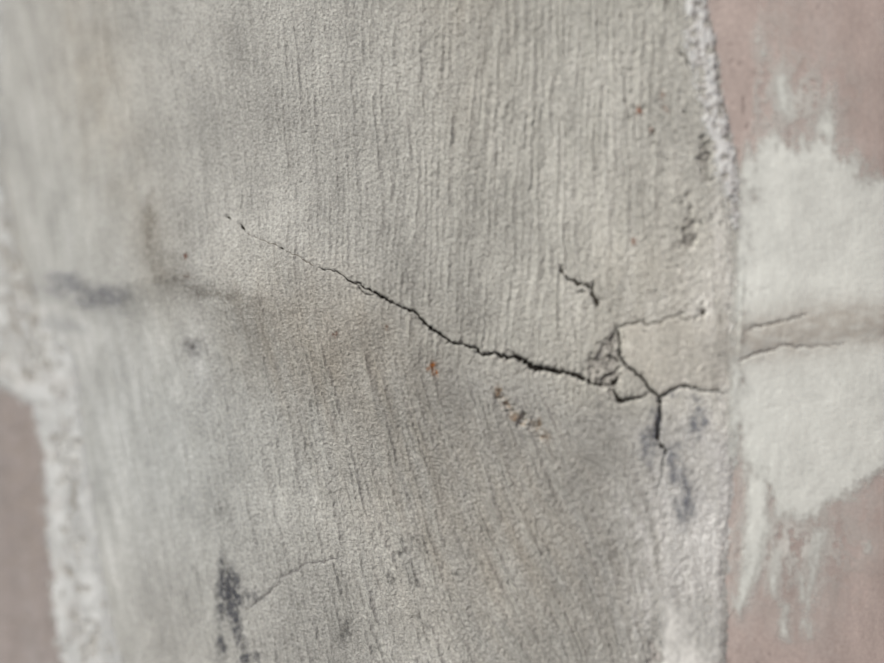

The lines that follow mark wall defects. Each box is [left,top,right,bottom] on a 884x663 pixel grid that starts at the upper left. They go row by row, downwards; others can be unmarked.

peeling [0,186,121,663]
crack [227,217,724,487]